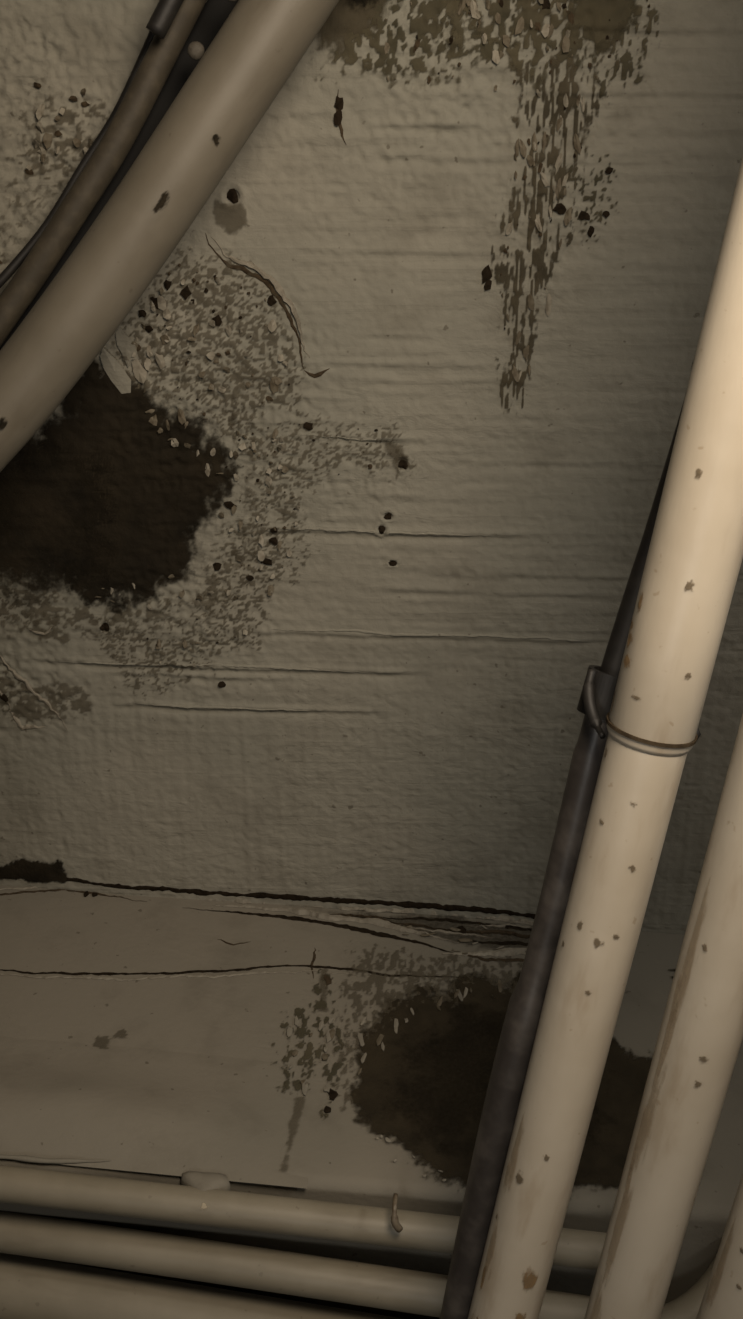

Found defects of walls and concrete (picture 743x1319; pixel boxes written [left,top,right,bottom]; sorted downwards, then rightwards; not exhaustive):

crack [205,233,330,378]
damp [318,0,659,411]
damp [0,360,255,636]
crack [0,878,536,981]
damp [333,944,523,1187]
damp [574,1038,652,1189]